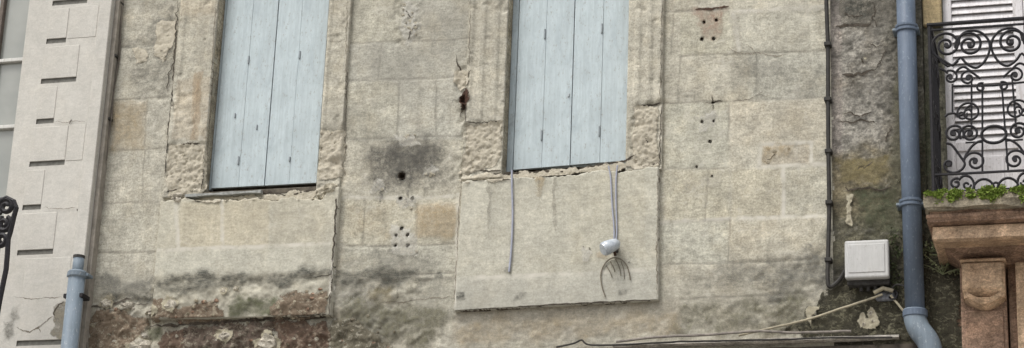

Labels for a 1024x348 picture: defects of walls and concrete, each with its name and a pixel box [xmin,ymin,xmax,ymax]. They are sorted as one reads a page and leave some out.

rust [459,88,470,110]
crack [91,1,348,340]
crack [17,296,60,333]
peeling [88,288,395,348]